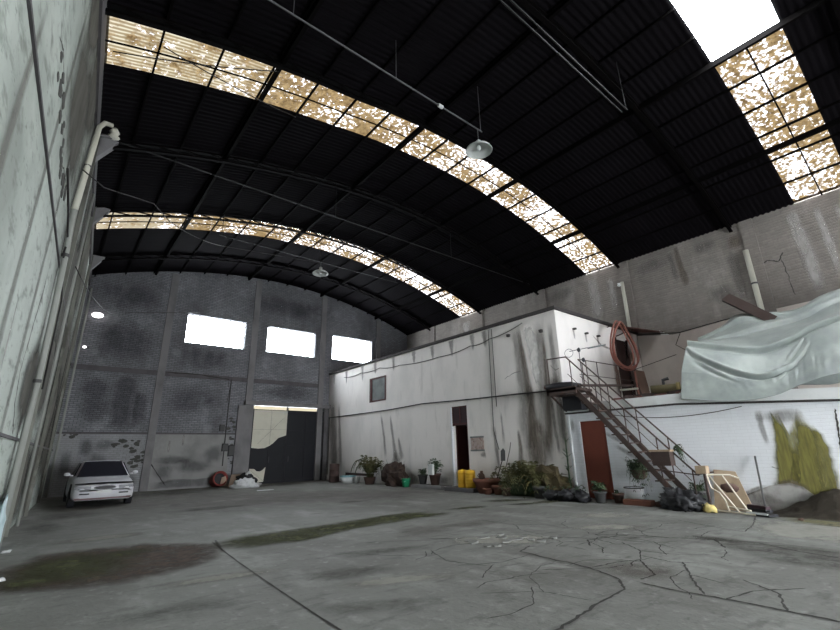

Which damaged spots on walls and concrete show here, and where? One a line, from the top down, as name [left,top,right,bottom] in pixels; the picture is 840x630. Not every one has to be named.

crack [764,252,796,295]
water stain [518,338,551,465]
spalling [111,439,145,468]
water stain [771,414,838,495]
crack [346,517,840,630]